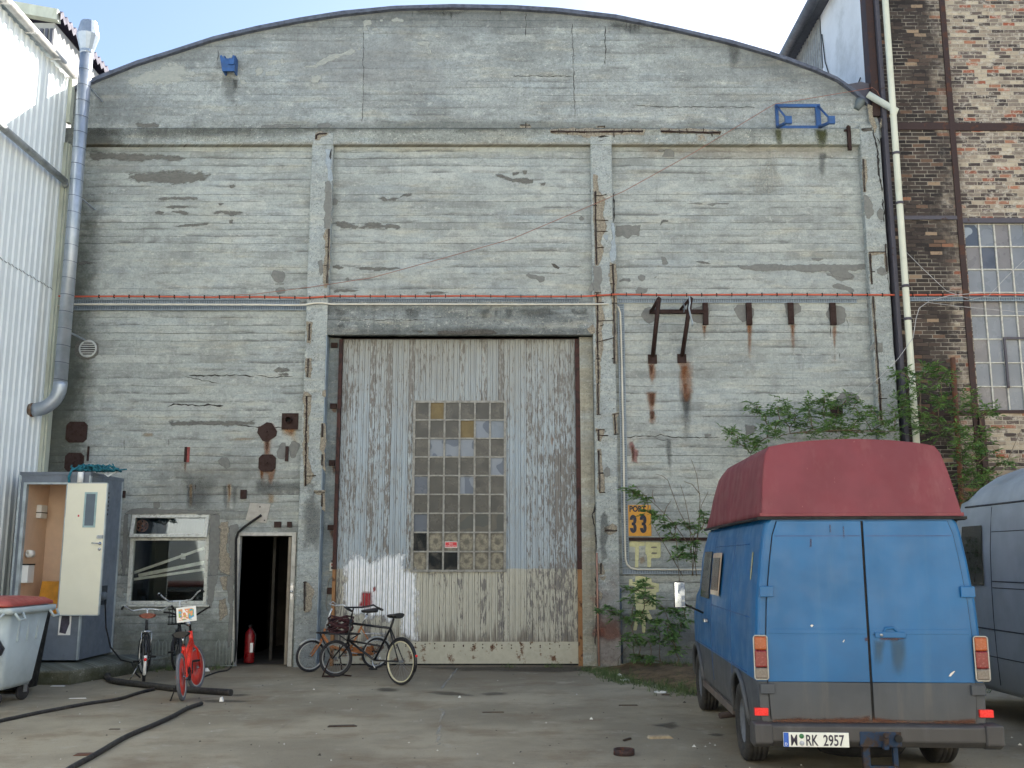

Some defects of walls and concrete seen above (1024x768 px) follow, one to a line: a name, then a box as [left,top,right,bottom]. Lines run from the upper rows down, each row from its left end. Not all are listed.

crack [515,24,575,109]
crack [168,374,292,407]